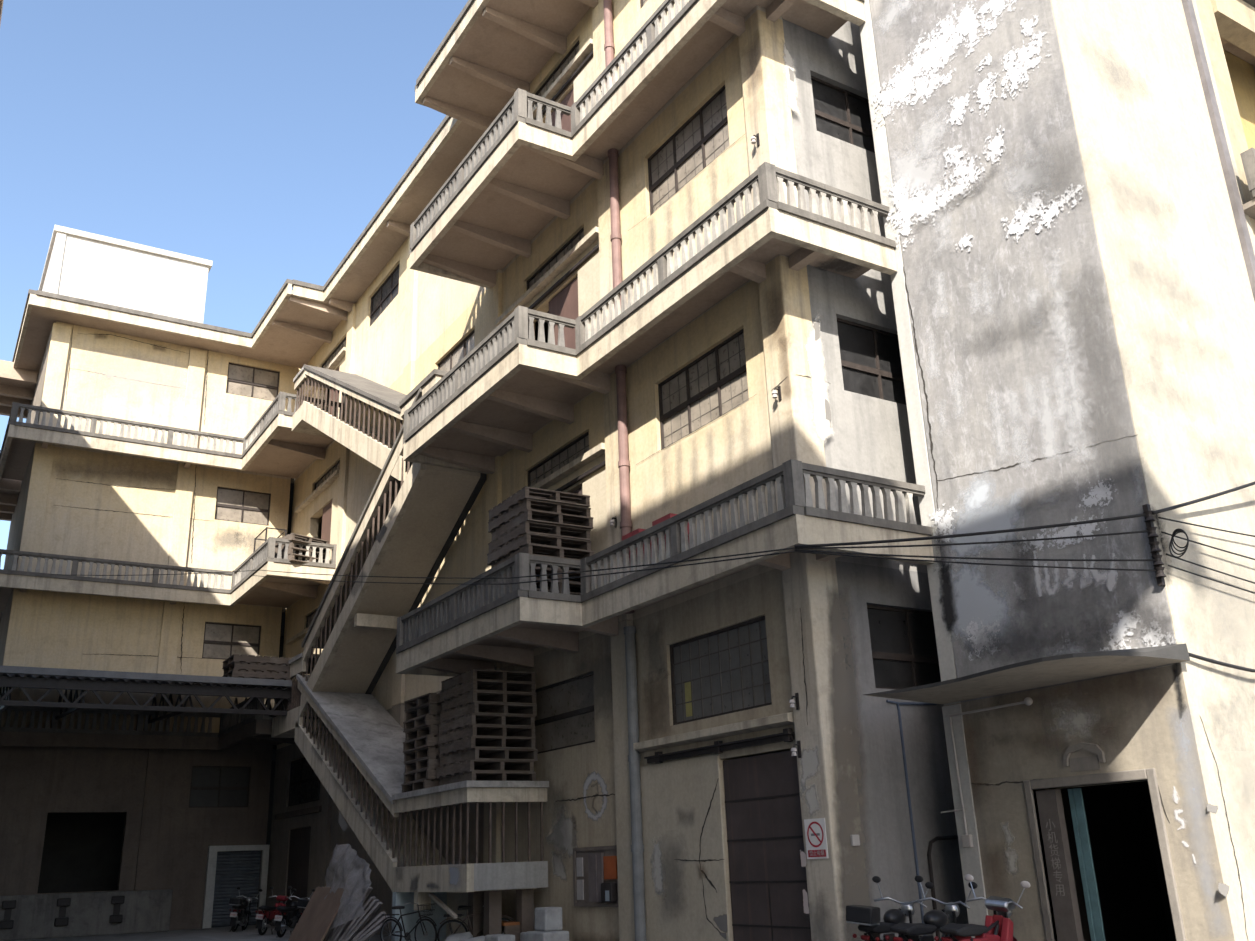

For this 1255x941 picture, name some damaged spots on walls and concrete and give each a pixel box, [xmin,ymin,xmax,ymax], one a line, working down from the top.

peeling [871,0,1084,252]
peeling [804,317,833,441]
crack [903,267,1138,509]
damp [937,529,957,631]
damp [1133,608,1168,639]
peeling [801,749,820,814]
crack [674,780,724,932]